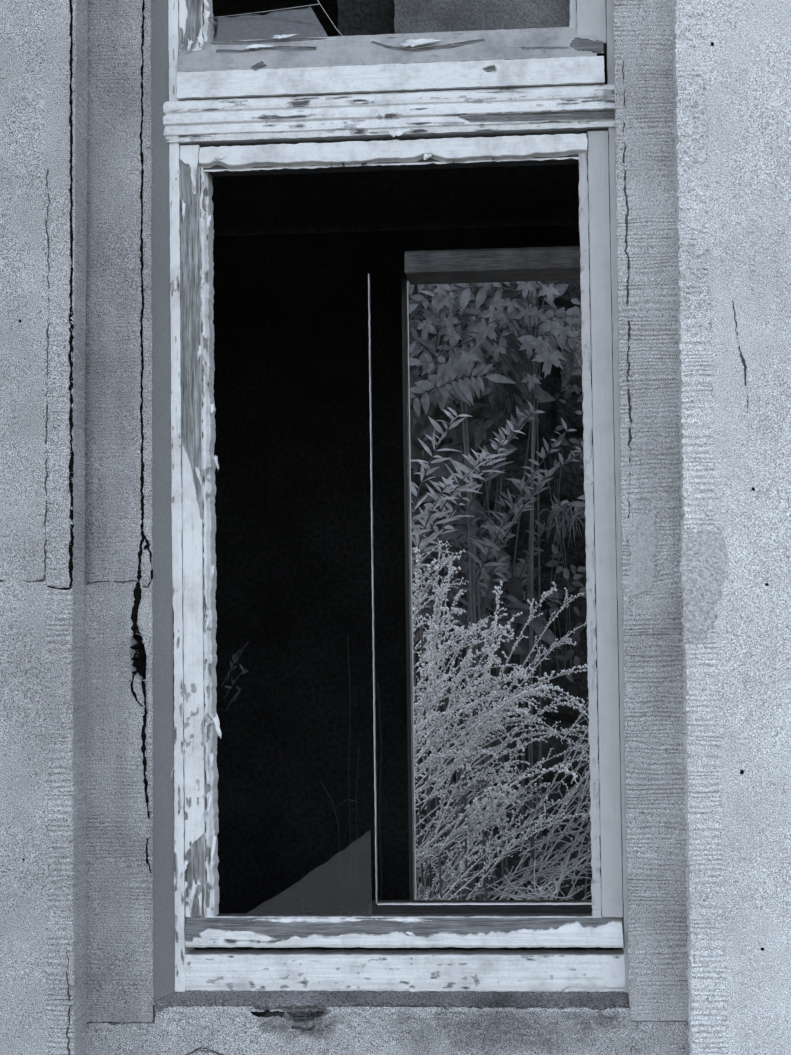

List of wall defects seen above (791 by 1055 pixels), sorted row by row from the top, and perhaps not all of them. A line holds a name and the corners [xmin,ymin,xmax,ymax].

peeling [172,0,339,71]
peeling [369,36,487,53]
peeling [521,35,604,53]
peeling [169,85,615,138]
crack [0,0,153,873]
peeling [171,659,622,977]
peeling [280,960,321,989]
peeling [335,955,480,992]
crack [186,1047,224,1055]